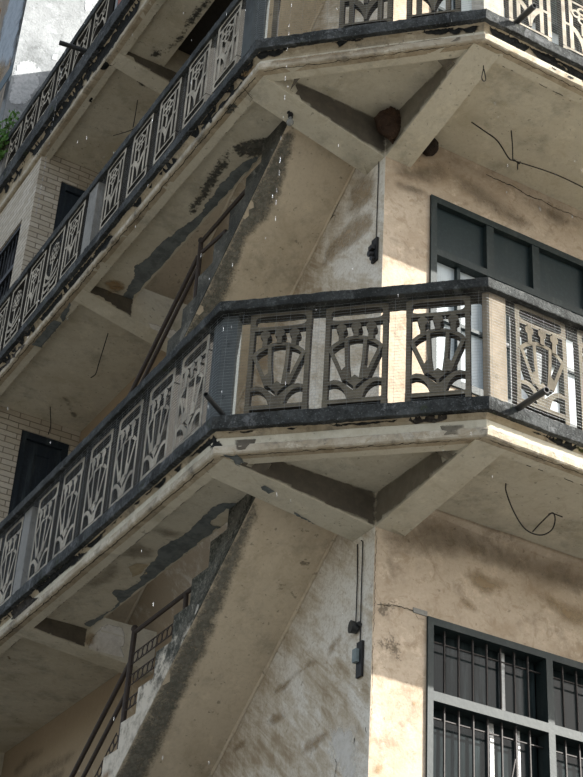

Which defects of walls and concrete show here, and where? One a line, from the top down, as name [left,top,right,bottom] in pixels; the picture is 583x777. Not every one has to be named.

leakage [189,136,269,215]
peeling [84,503,237,658]